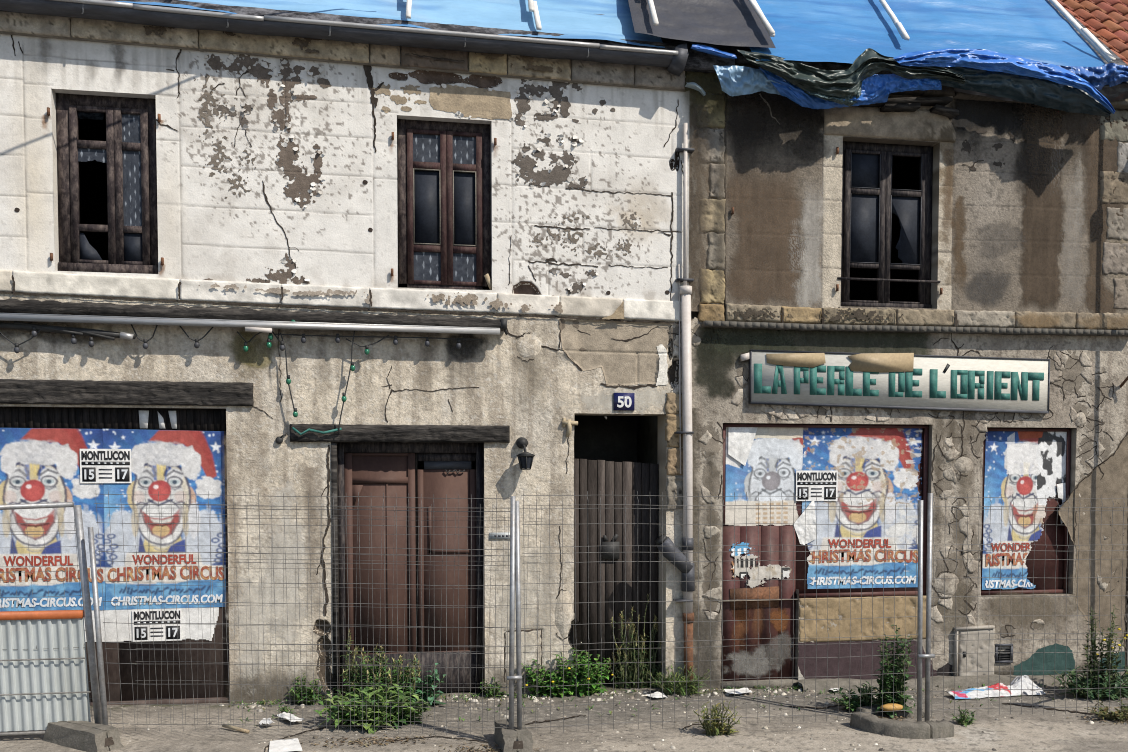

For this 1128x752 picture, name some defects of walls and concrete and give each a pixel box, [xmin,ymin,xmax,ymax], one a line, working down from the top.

crack [166,49,182,98]
crack [210,71,249,97]
peeling [194,38,331,209]
crack [0,100,683,423]
crack [363,65,384,152]
peeling [373,52,588,189]
flaking render [670,148,680,171]
leakage [687,71,824,306]
leakage [943,99,1128,328]
crack [316,445,331,616]
peeling [697,422,725,620]
flaking render [1047,346,1128,672]